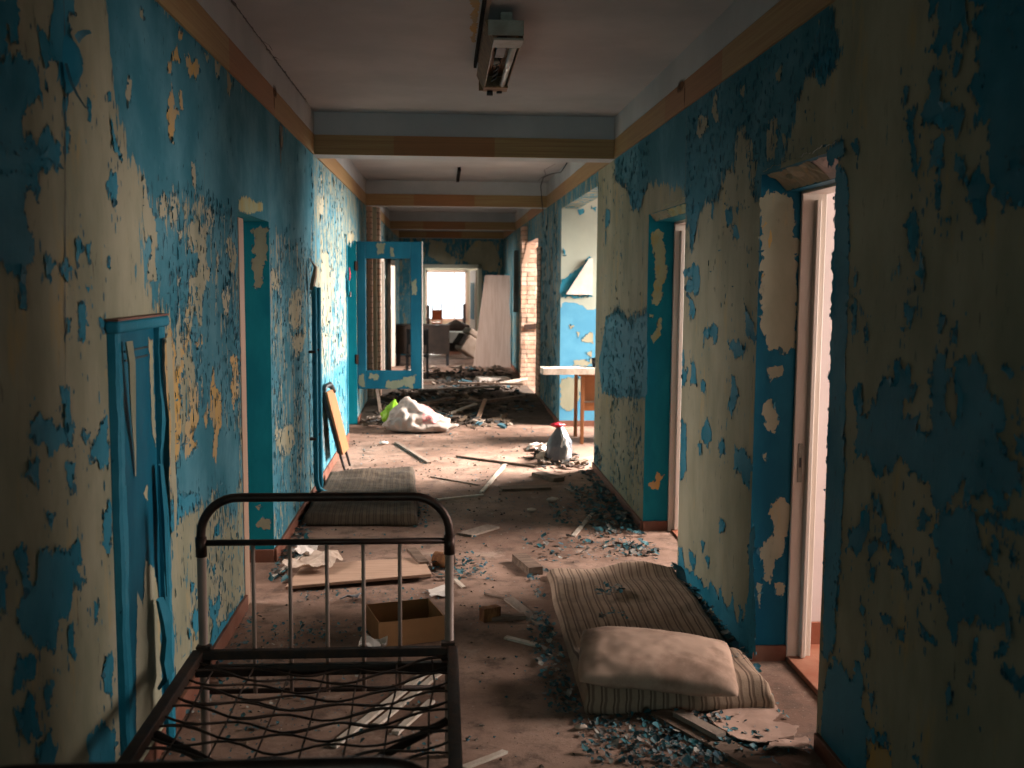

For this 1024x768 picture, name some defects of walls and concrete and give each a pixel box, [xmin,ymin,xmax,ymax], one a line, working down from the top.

peeling [0,0,111,359]
peeling [105,73,132,232]
peeling [140,0,234,144]
peeling [428,239,500,272]
peeling [21,384,113,564]
peeling [125,341,136,476]
peeling [136,130,354,733]
peeling [522,0,1024,768]
peeling [0,510,102,764]
peeling [86,650,120,763]